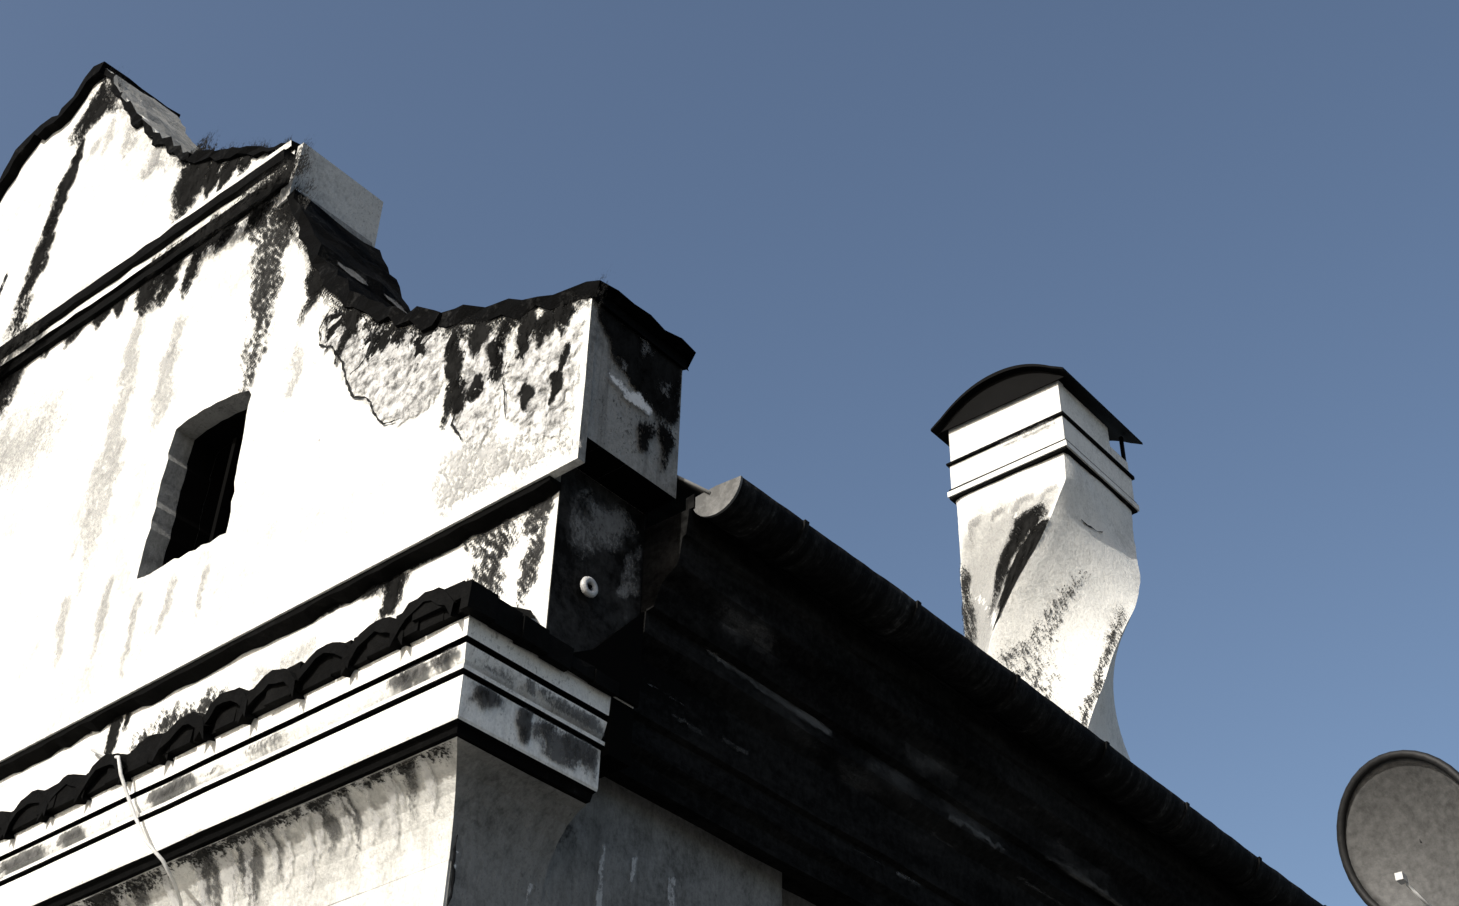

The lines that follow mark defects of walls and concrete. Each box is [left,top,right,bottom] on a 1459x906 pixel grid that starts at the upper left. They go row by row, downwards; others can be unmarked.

leakage [2,102,270,340]
leakage [234,170,315,403]
leakage [323,297,345,351]
flaking render [319,294,586,516]
leakage [439,308,554,428]
leakage [517,342,570,411]
leakage [494,525,544,607]
leakage [960,484,1056,644]
leakage [997,571,1087,699]
leakage [1068,604,1127,727]
leakage [186,844,222,906]
leakage [229,821,283,906]